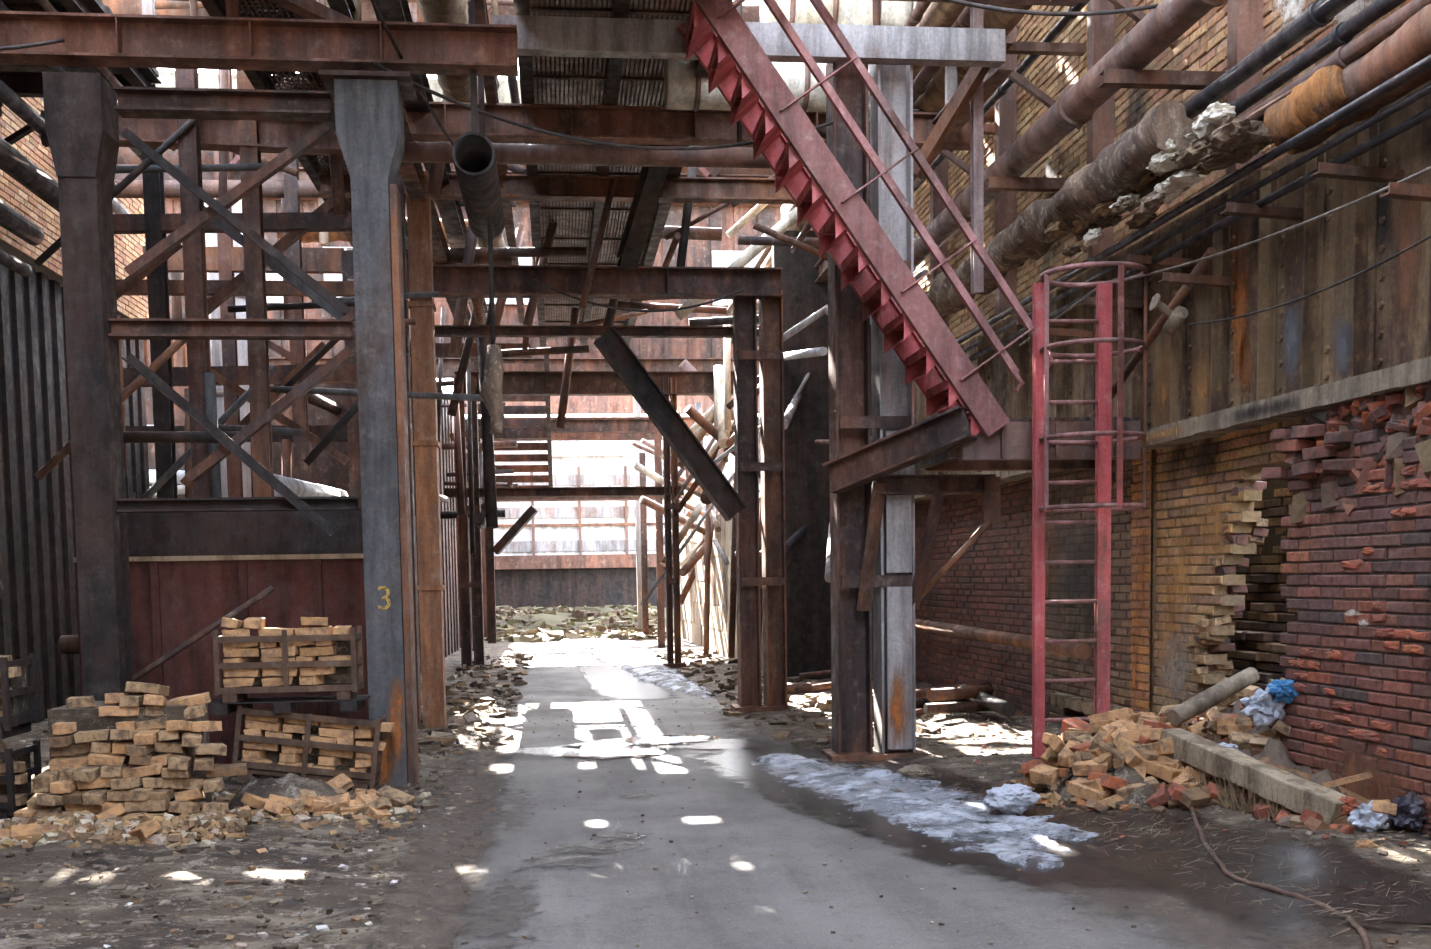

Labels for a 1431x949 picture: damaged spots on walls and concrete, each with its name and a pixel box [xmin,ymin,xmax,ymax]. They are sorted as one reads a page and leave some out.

rust [1229,240,1250,391]
spalling [1352,466,1431,495]
spalling [1390,508,1416,517]
spalling [1186,480,1269,690]
spalling [1341,547,1375,569]
spalling [1370,602,1431,655]
rust [890,677,904,736]
spalling [1289,647,1392,758]